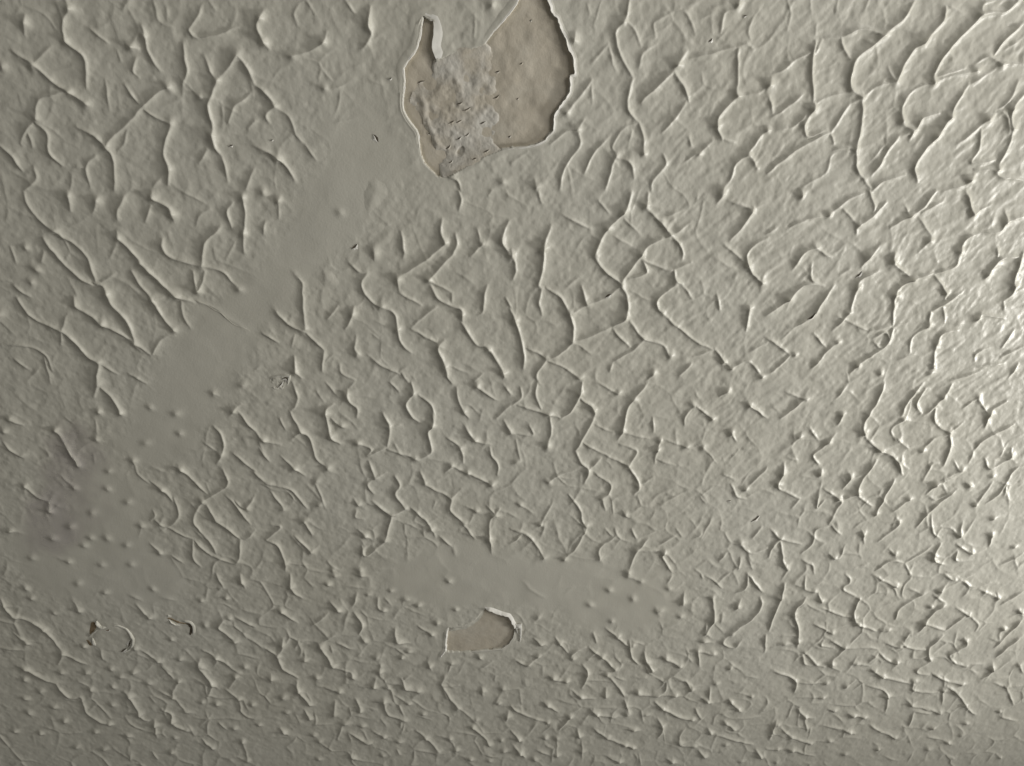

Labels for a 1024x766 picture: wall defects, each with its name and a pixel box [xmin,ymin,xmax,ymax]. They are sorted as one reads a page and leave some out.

peeling [396,0,579,179]
peeling [438,607,522,659]